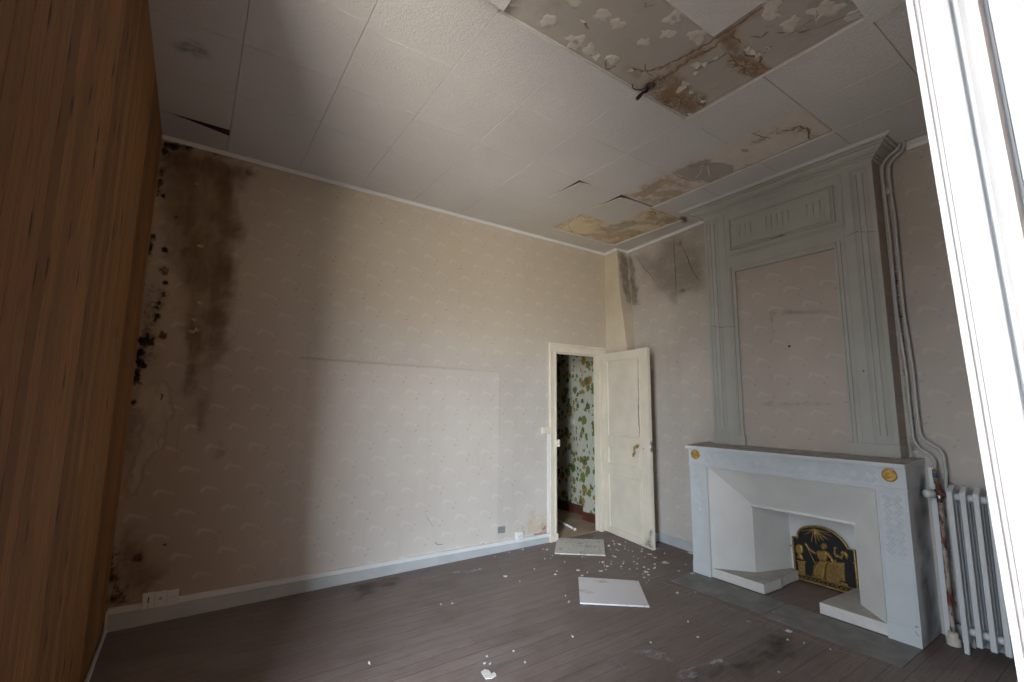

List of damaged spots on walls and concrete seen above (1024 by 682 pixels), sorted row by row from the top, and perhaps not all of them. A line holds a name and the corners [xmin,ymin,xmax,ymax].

peeling [505,0,863,116]
mould [162,142,192,155]
peeling [555,108,832,244]
mould [133,266,168,384]